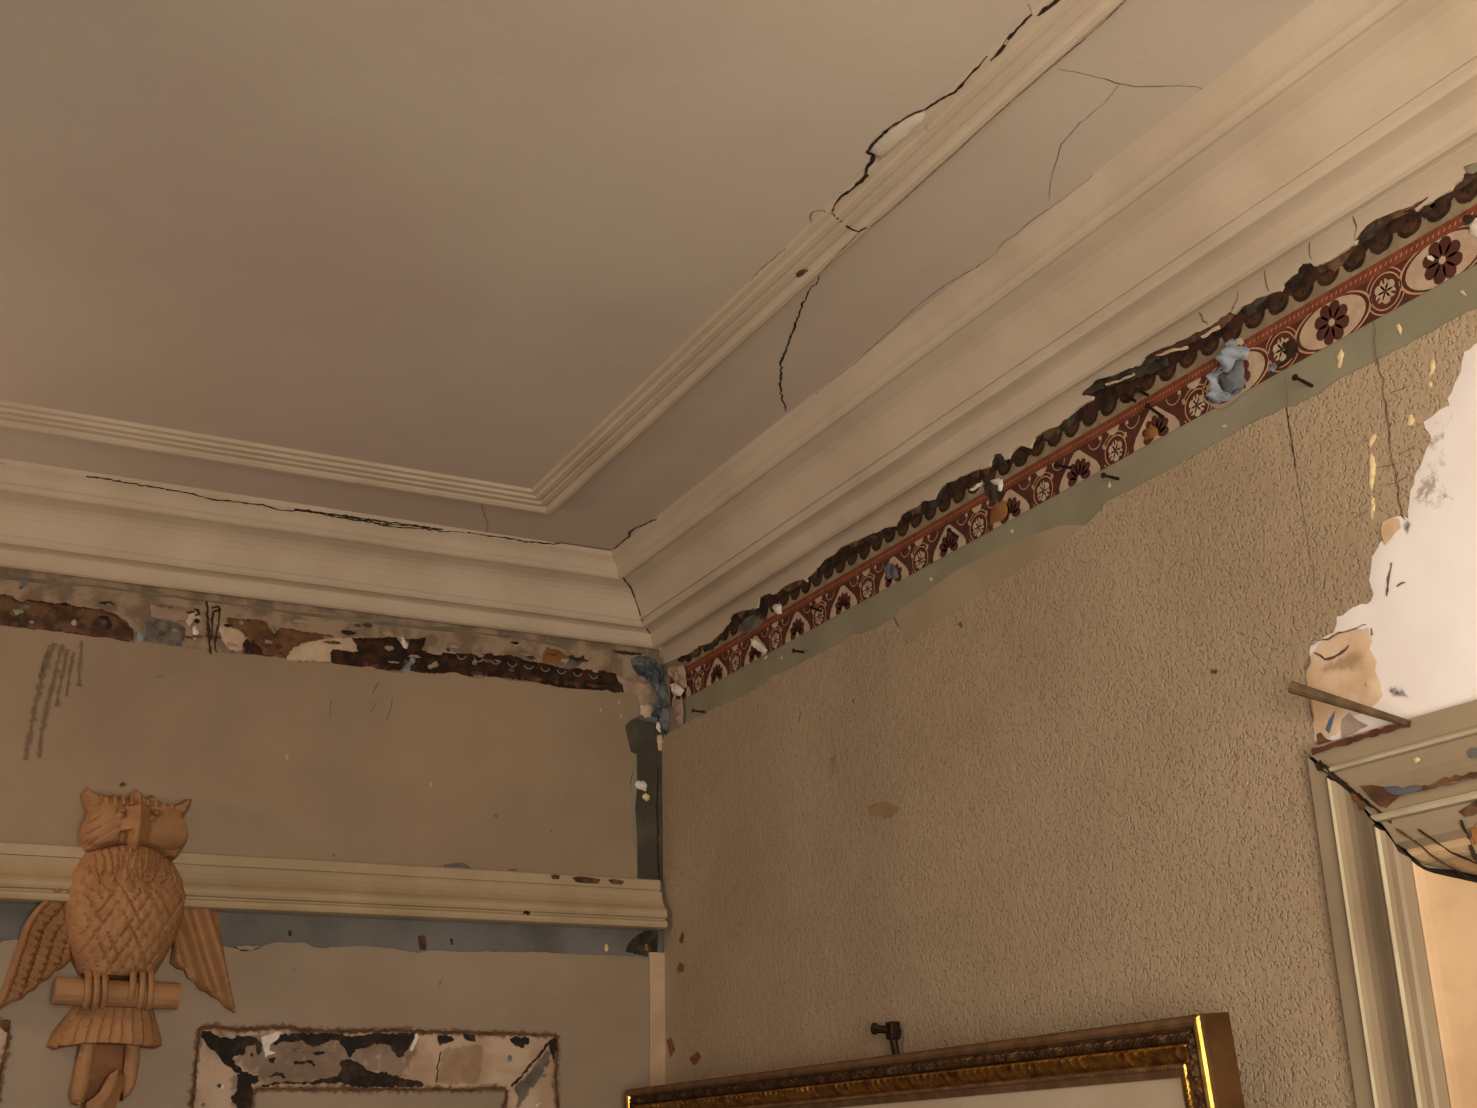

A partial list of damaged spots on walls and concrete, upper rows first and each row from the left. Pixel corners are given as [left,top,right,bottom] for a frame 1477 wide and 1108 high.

crack [779,0,1201,411]
crack [86,476,653,641]
crack [1285,377,1316,591]
crack [1355,321,1416,520]
flaking render [0,567,687,751]
peeling [1384,785,1422,795]